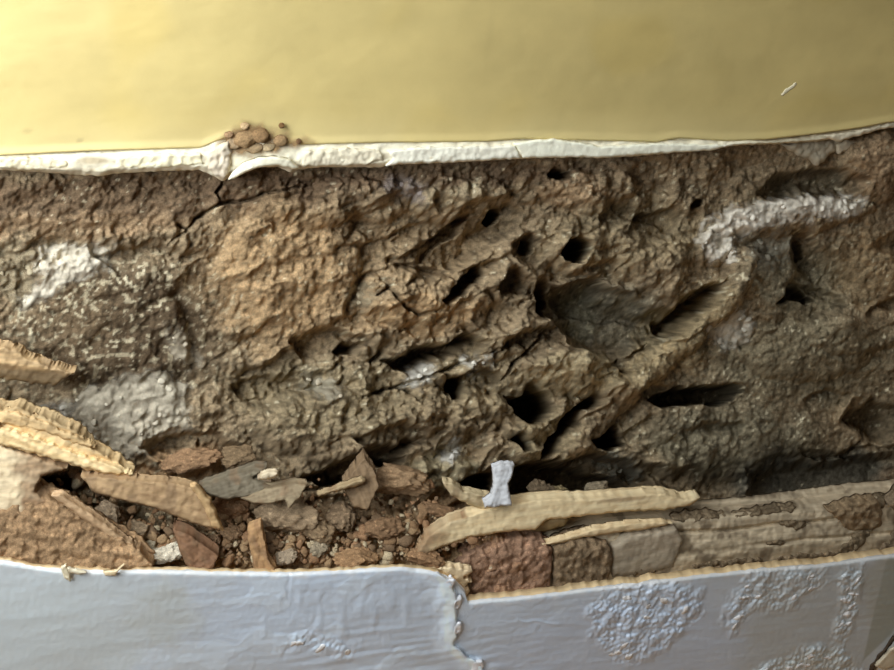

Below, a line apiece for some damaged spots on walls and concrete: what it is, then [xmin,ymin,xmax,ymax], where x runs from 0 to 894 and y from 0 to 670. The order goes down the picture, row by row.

flaking render [0,122,894,181]
crack [167,181,309,246]
peeling [61,563,87,582]
peeling [103,563,124,576]
peeling [719,562,867,670]
peeling [875,646,894,670]